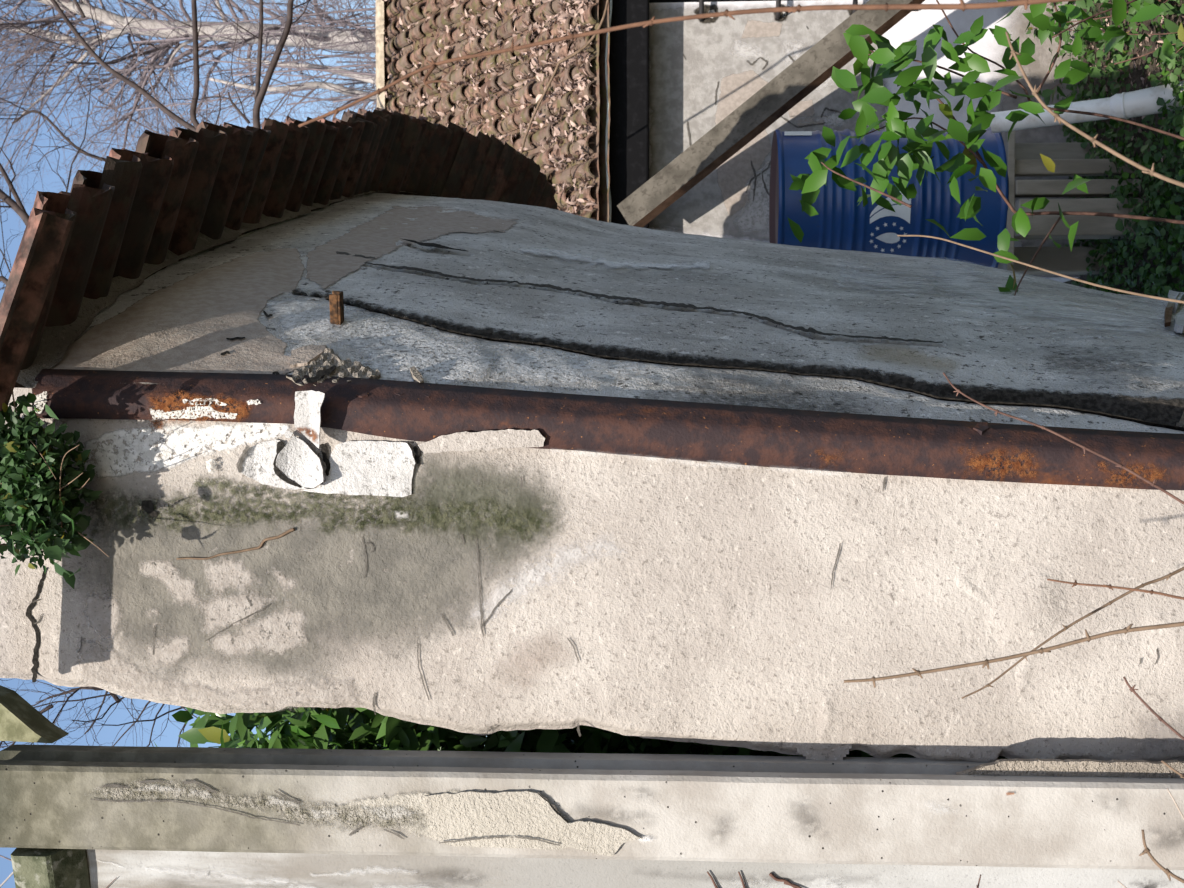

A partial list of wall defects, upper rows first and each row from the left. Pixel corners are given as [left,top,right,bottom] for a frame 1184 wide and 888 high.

crack [336,238,943,343]
corrosion [150,392,248,428]
peeling [51,205,519,497]
crack [292,288,1184,431]
corrosion [969,451,1033,478]
crack [26,567,47,683]
leakage [96,471,552,674]
leakage [488,545,610,610]